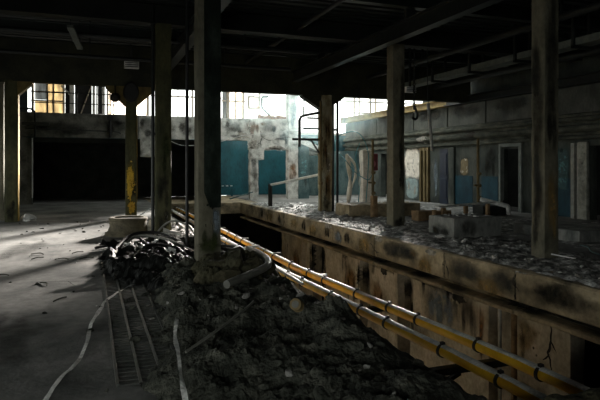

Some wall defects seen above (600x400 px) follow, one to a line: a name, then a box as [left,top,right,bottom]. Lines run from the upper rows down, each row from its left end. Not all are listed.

peeling [126,161,136,214]
crack [543,327,556,370]